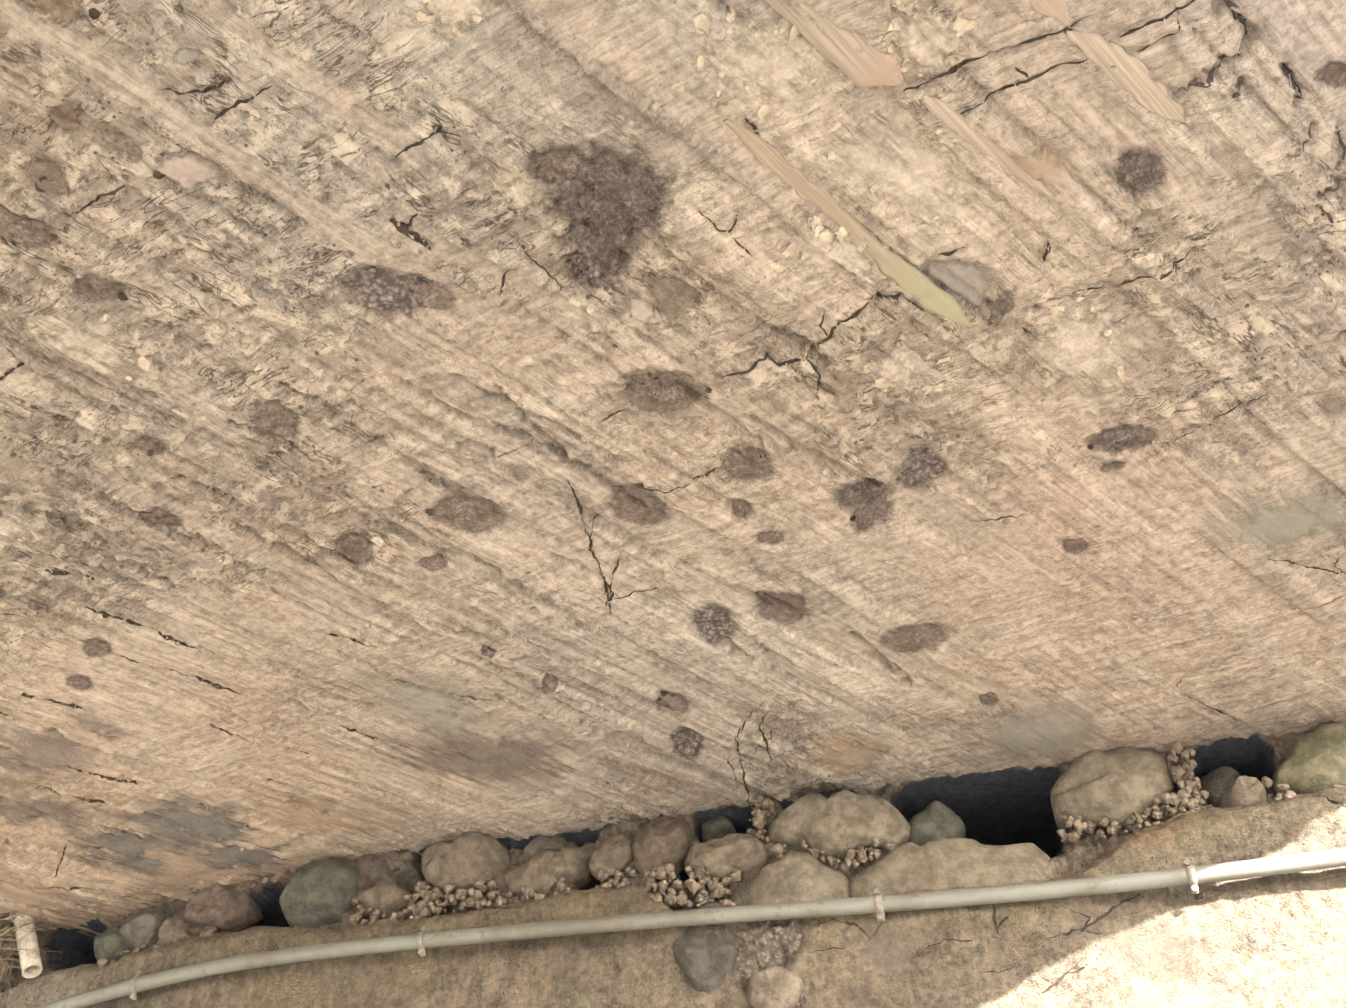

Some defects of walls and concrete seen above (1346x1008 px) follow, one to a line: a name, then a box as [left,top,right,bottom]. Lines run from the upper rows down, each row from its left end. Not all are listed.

crack [903,17,1087,115]
crack [1119,0,1196,52]
peeling [693,2,1004,240]
peeling [776,215,874,286]
spalling [922,259,1014,323]
crack [721,291,927,393]
crack [567,480,668,614]